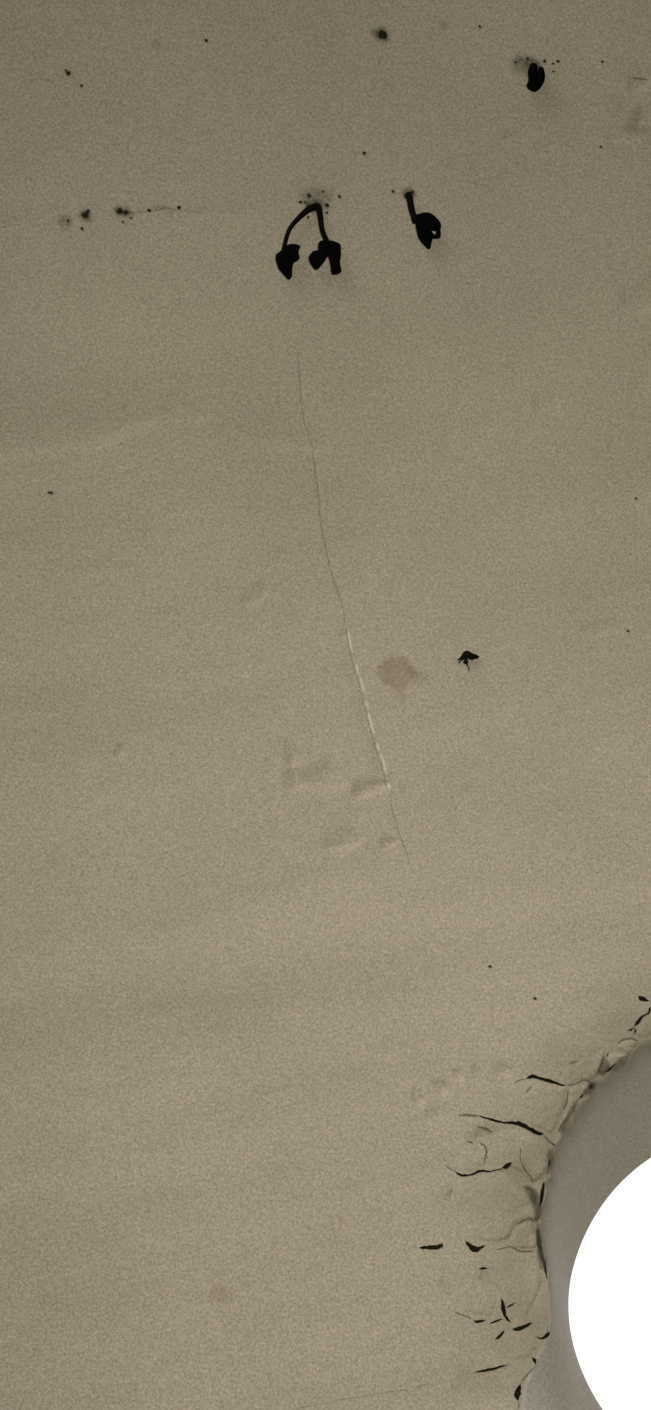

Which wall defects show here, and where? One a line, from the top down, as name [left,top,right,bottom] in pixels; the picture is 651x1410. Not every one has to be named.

crack [336,609,408,853]
crack [516,996,651,1099]
crack [455,1114,555,1279]
crack [419,1241,550,1401]